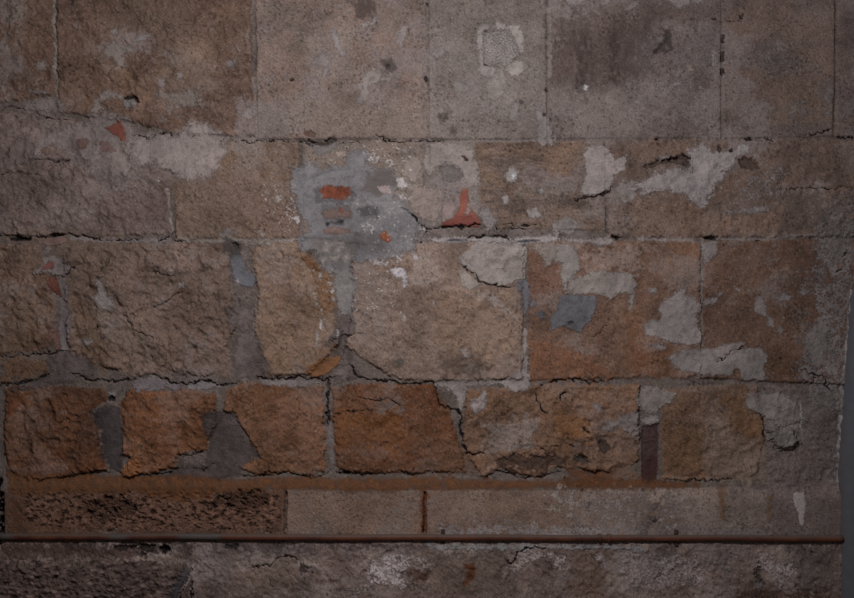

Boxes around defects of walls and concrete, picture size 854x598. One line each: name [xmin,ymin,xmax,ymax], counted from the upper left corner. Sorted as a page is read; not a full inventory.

crack [235,137,294,145]
crack [339,135,444,144]
crack [799,129,854,139]
crack [574,187,611,202]
flaking render [320,185,352,234]
peeling [533,214,580,266]
crack [72,373,237,386]
crack [257,365,481,456]
rust [8,468,699,532]